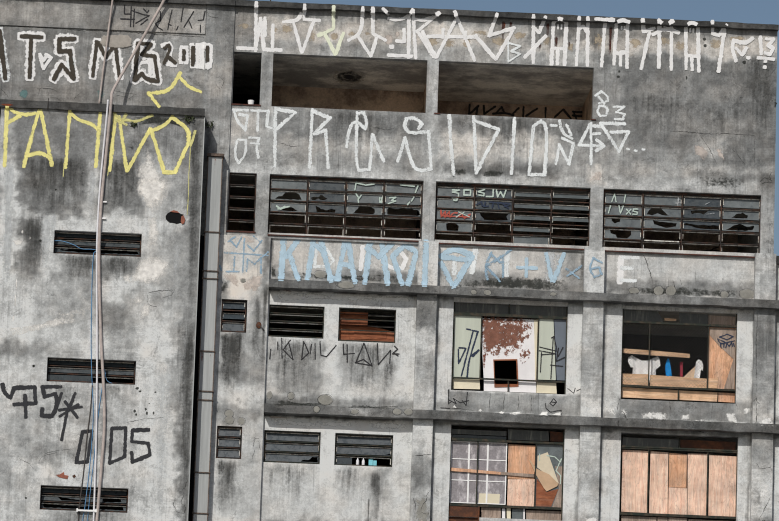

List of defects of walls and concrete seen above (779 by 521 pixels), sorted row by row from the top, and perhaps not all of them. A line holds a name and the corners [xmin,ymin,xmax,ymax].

water stain [334,70,365,84]
spalling [166,210,185,224]